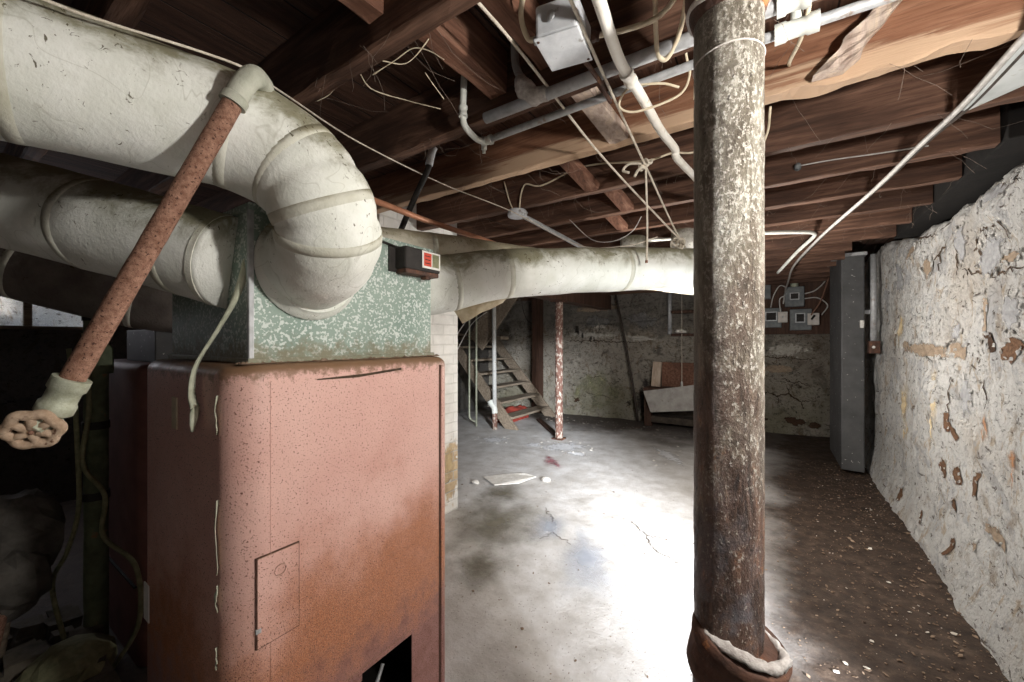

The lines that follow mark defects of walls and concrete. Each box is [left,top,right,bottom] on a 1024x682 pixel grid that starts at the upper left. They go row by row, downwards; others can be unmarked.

peeling [952,222,1024,364]
peeling [894,320,966,360]
crack [765,353,816,409]
peeling [941,373,973,441]
spalling [938,458,981,513]